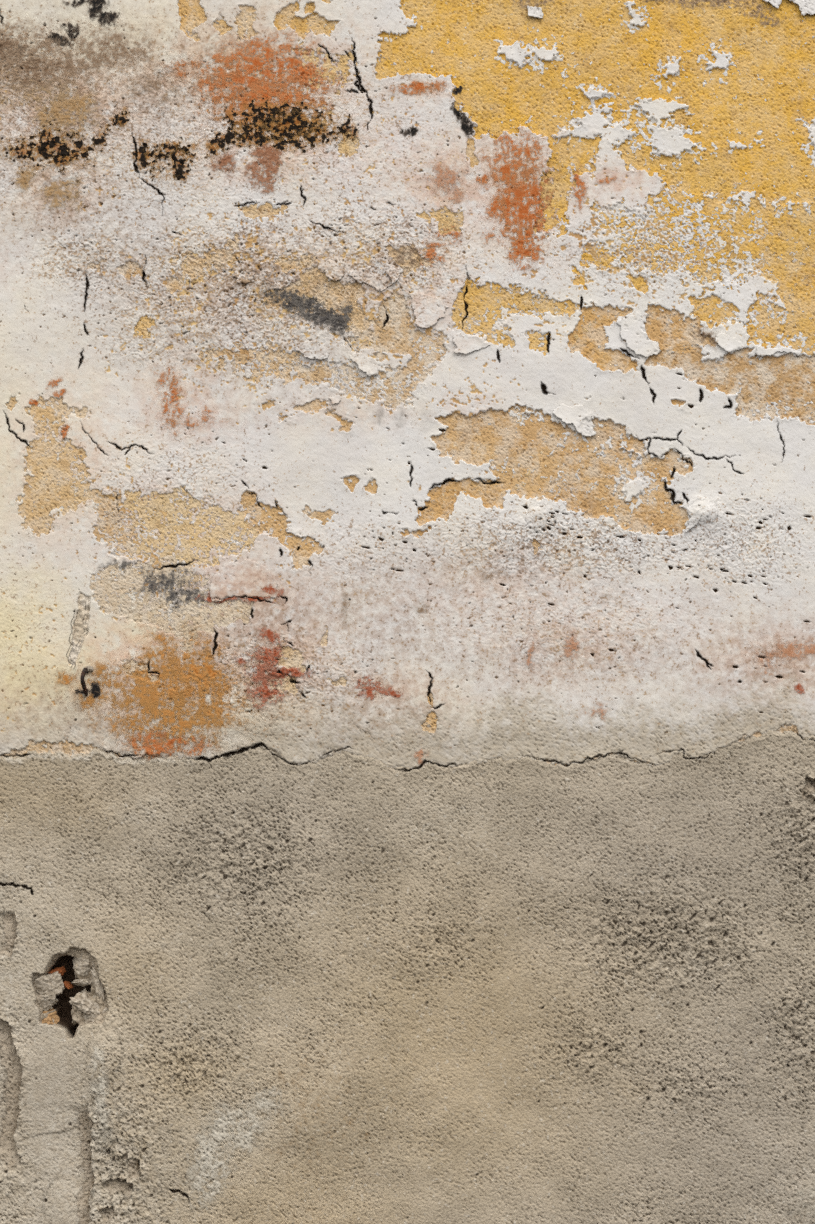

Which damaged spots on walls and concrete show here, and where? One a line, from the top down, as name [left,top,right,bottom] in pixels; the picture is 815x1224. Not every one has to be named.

peeling [177,0,258,42]
water stain [132,98,359,185]
rust [167,34,340,193]
peeling [198,0,815,432]
rust [476,132,553,270]
peeling [6,393,324,667]
peeling [401,404,767,585]
rust [79,627,310,759]
crack [196,743,353,765]
crack [395,760,459,771]
crack [532,749,712,766]
crack [0,883,33,894]